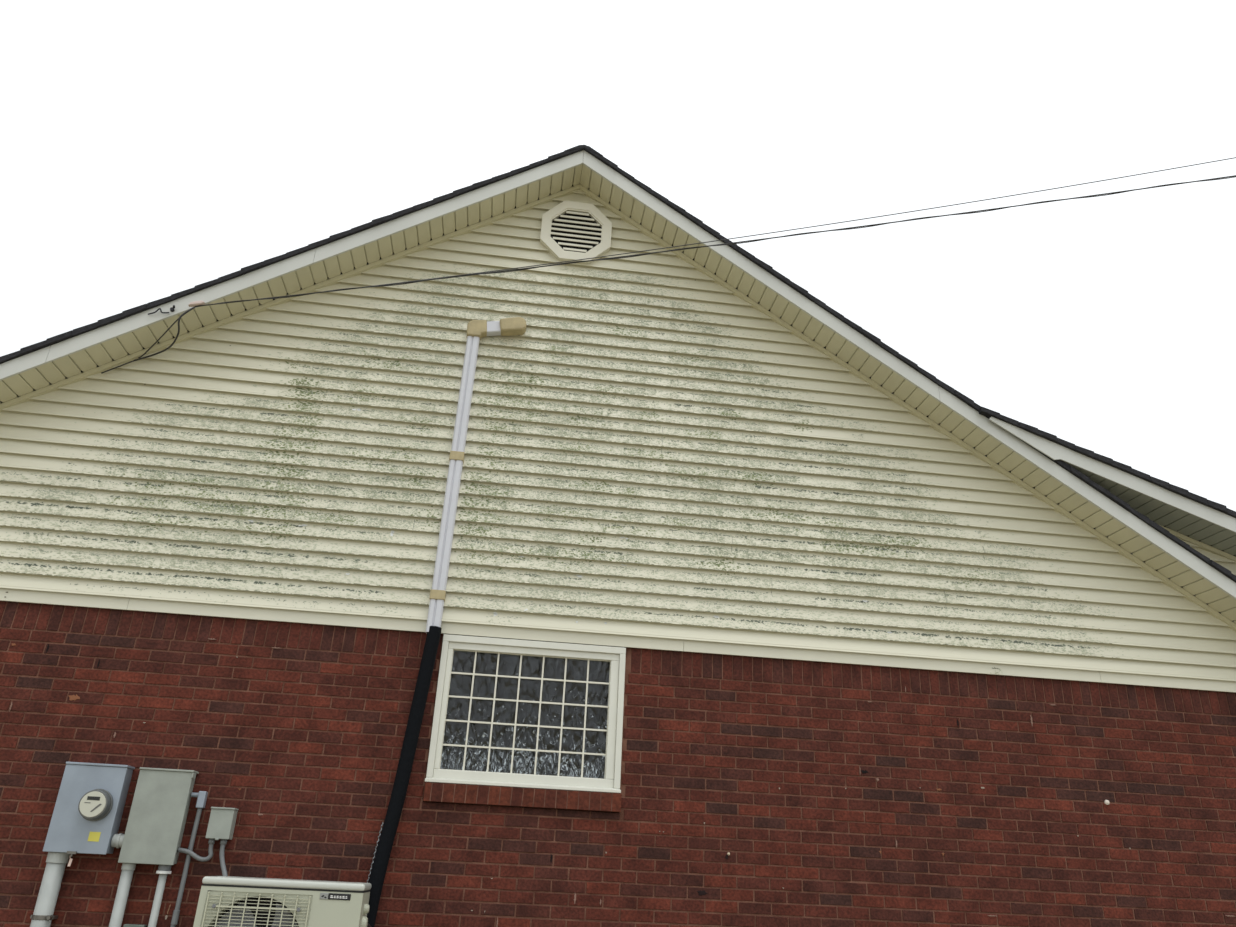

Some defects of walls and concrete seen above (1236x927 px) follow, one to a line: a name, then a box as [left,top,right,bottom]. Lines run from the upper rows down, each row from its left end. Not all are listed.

water stain [0,264,1133,659]